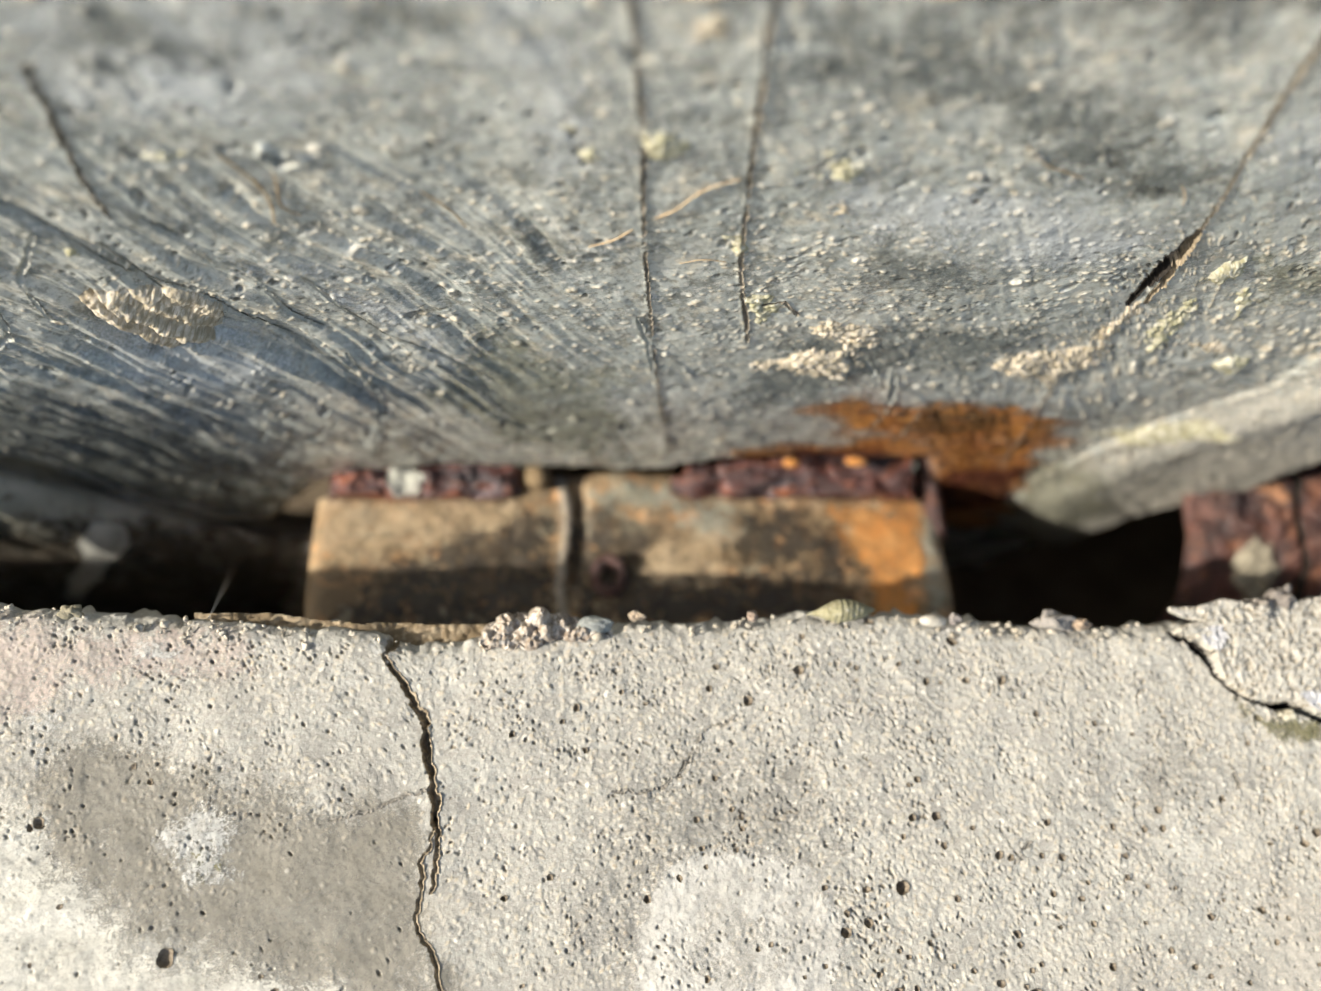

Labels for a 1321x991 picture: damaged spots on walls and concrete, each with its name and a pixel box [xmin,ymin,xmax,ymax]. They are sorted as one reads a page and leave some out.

crack [628,0,670,451]
crack [737,0,800,344]
crack [1199,36,1321,230]
corrosion [329,463,523,502]
corrosion [669,399,1076,615]
corrosion [1159,462,1321,623]
crack [1166,625,1321,725]
water stain [0,611,464,991]
crack [328,638,443,991]